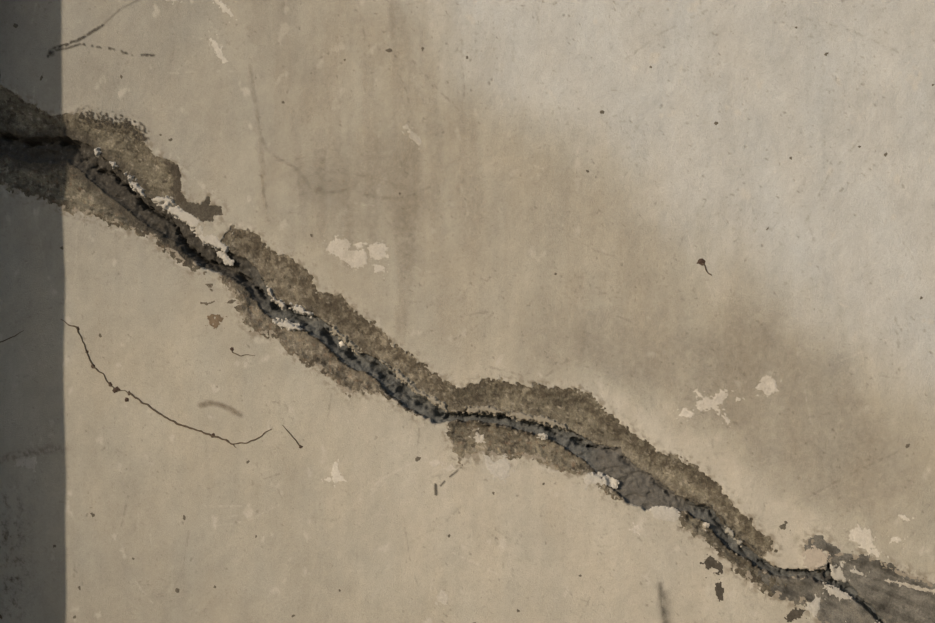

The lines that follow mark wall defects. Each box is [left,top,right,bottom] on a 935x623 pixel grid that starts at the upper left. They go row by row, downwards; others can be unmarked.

spalling [0,85,223,222]
spalling [0,154,423,416]
crack [0,133,884,623]
spalling [221,225,935,623]